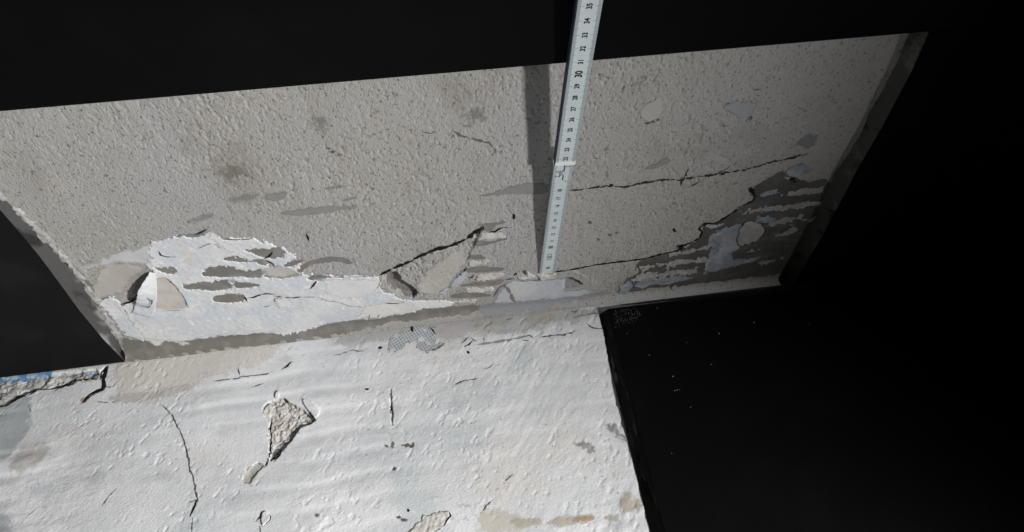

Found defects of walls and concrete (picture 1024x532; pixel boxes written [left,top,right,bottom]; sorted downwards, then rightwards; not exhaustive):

peeling [84,214,592,362]
crack [556,153,808,272]
spalling [618,163,830,295]
spalling [0,370,104,407]
crack [80,366,116,412]
crack [162,405,198,530]
spalling [243,390,320,483]